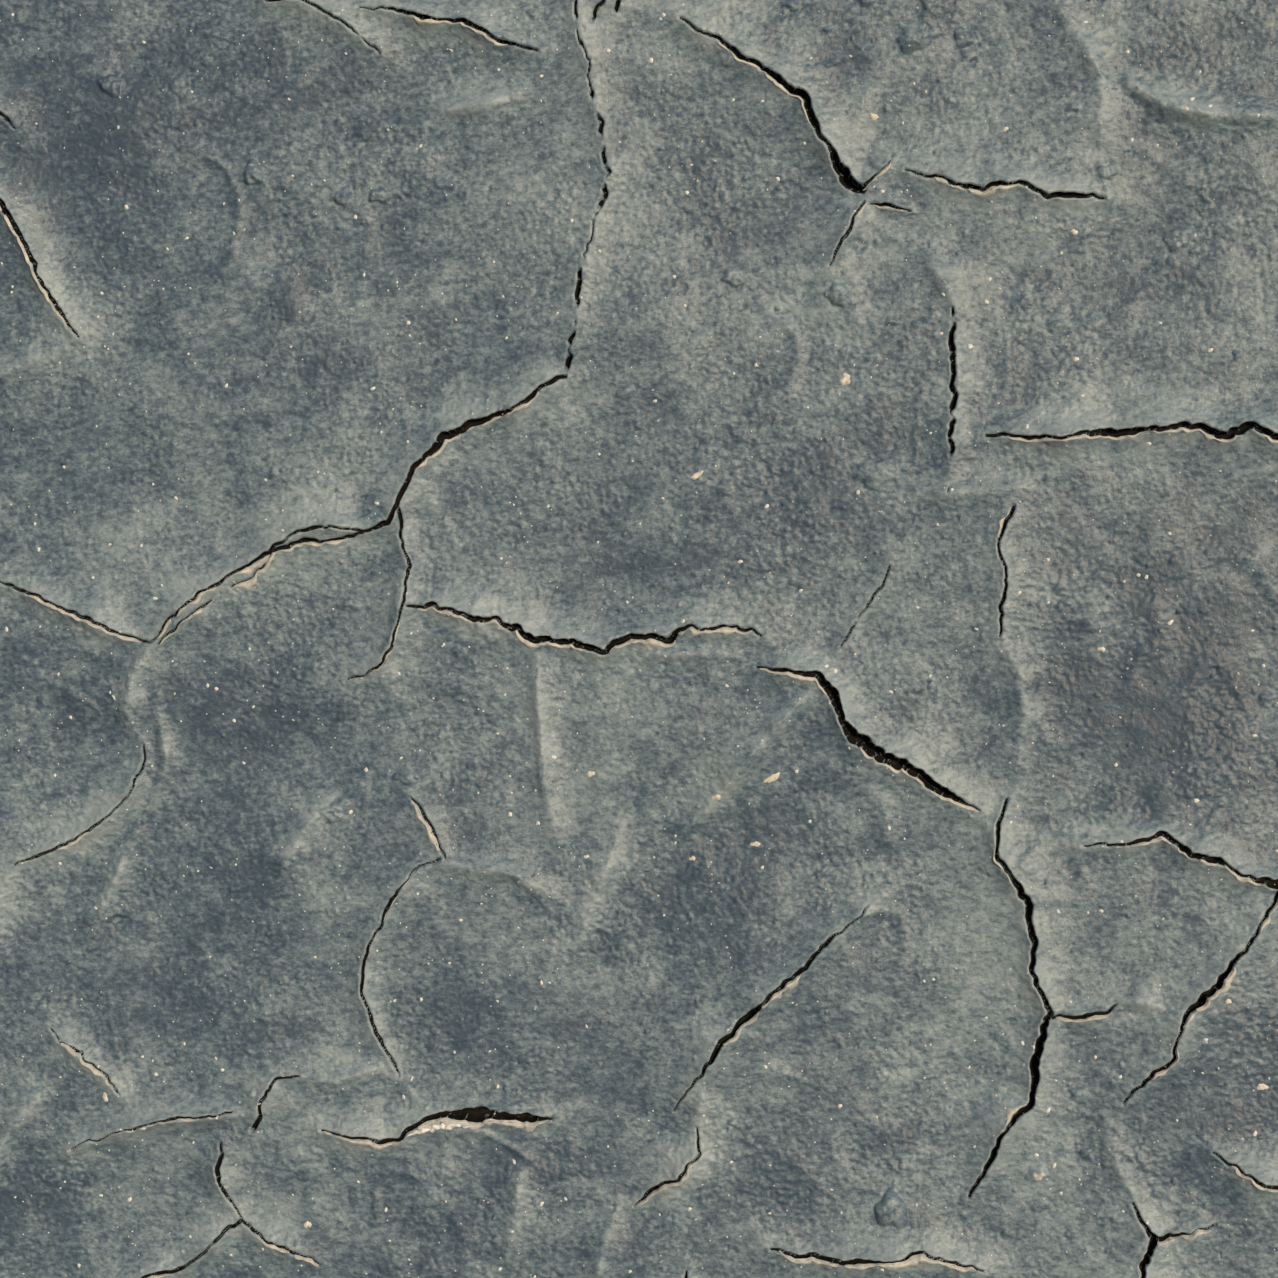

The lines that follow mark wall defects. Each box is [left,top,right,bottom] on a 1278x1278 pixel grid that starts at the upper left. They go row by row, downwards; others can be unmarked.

crack [673,9,1115,266]
crack [0,0,769,687]
crack [937,309,1278,492]
crack [988,501,1030,637]
crack [8,737,149,867]
crack [43,1022,324,1278]
crack [315,794,559,1158]
crack [629,878,898,1209]
crack [750,553,1118,1205]
crack [1069,821,1278,1109]